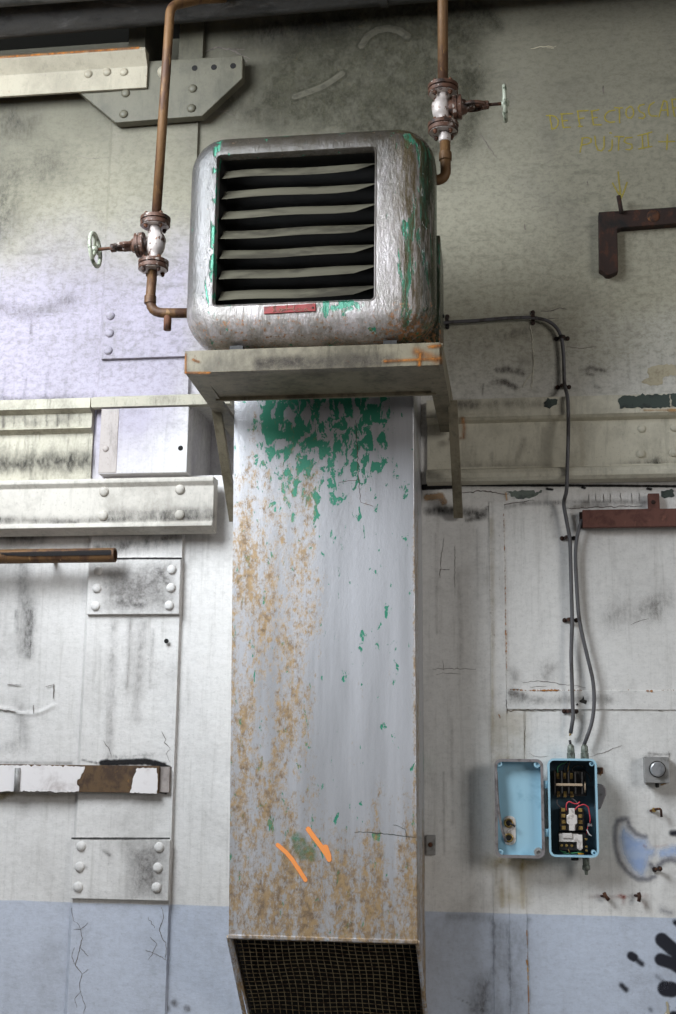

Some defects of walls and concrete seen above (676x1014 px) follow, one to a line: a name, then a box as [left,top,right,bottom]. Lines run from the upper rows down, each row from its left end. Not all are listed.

peeling [618,364,676,409]
crack [71,908,88,1010]